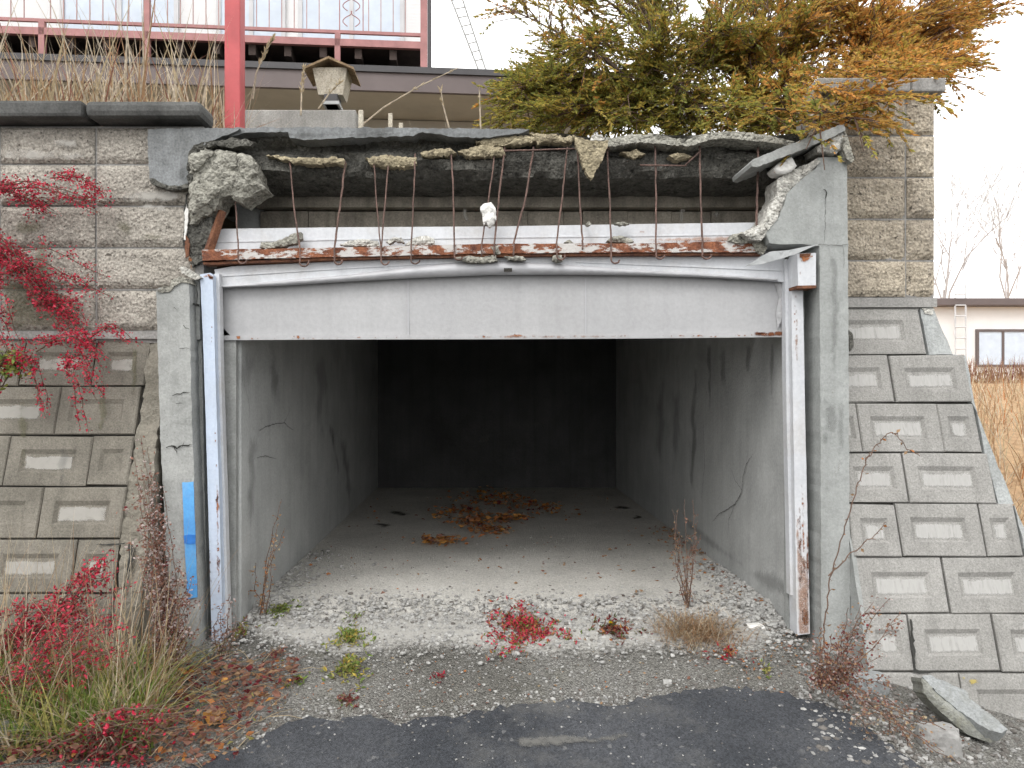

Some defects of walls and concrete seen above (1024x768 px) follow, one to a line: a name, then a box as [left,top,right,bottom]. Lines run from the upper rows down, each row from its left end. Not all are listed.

spalling [365,133,573,171]
spalling [590,131,794,163]
spalling [738,157,821,243]
peeling [747,244,818,266]
corrosion [797,503,809,633]